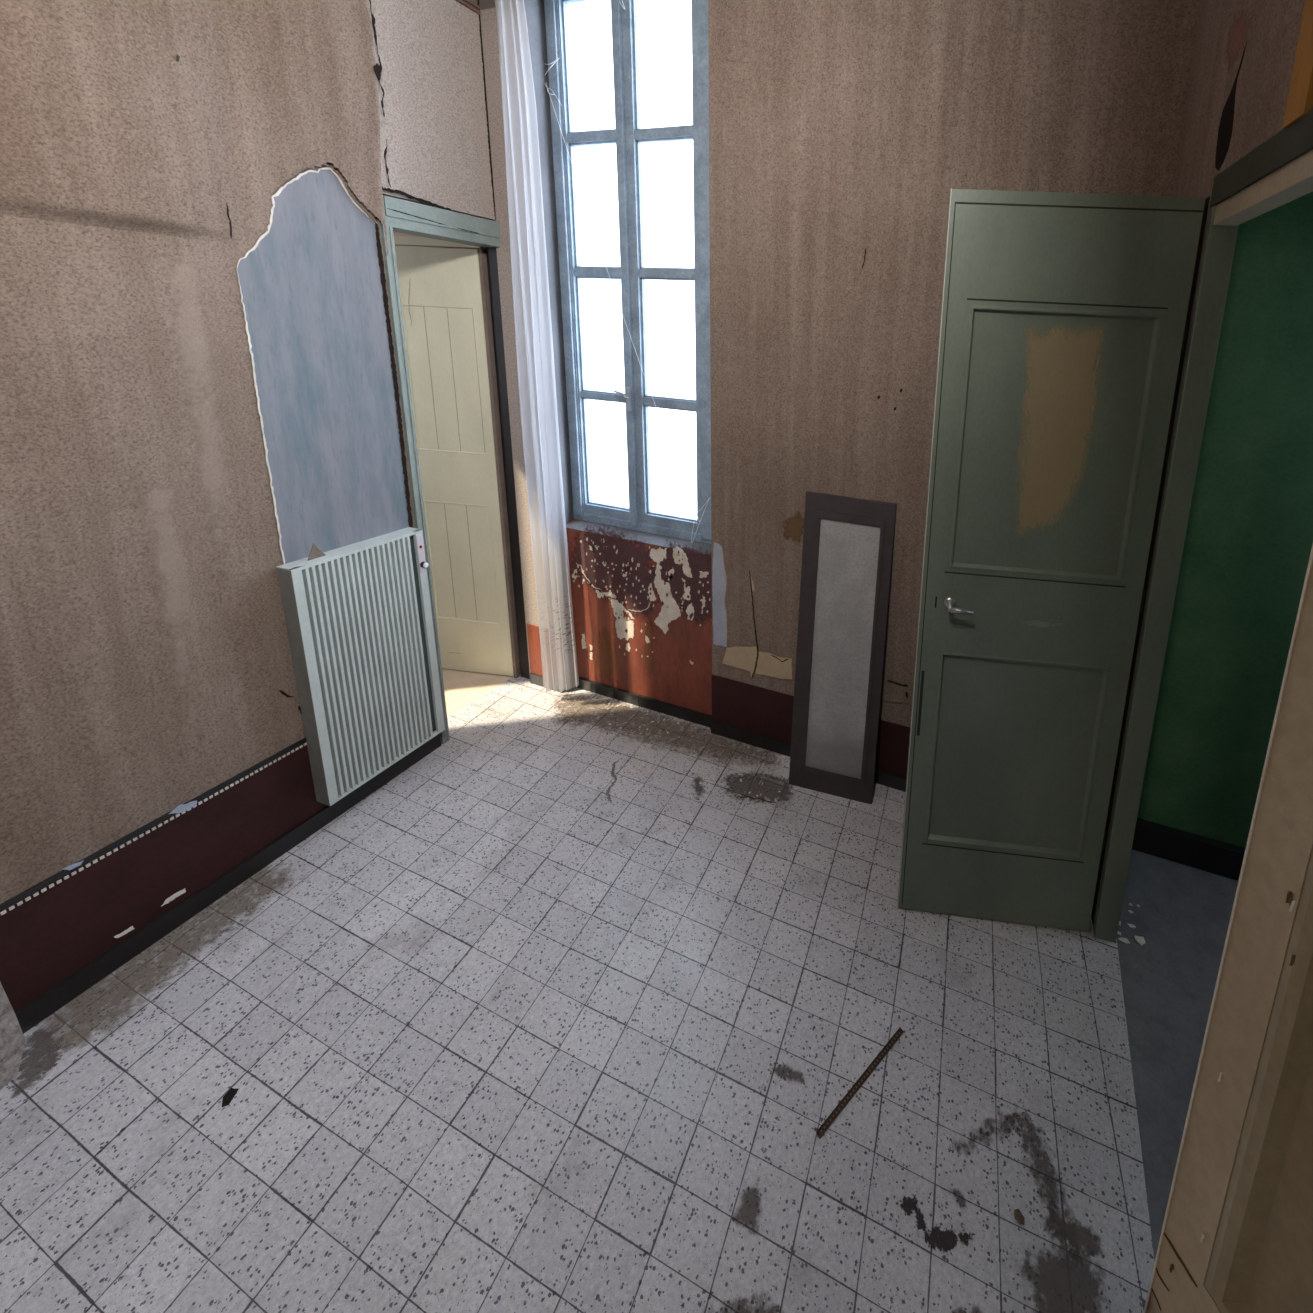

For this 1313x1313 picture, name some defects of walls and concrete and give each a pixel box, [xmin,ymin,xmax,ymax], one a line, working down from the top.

crack [369,0,391,188]
peeling [236,168,409,564]
peeling [571,537,728,657]
water stain [556,696,793,803]
water stain [900,1195,975,1252]
water stain [953,1190,966,1207]
water stain [955,1112,1106,1313]